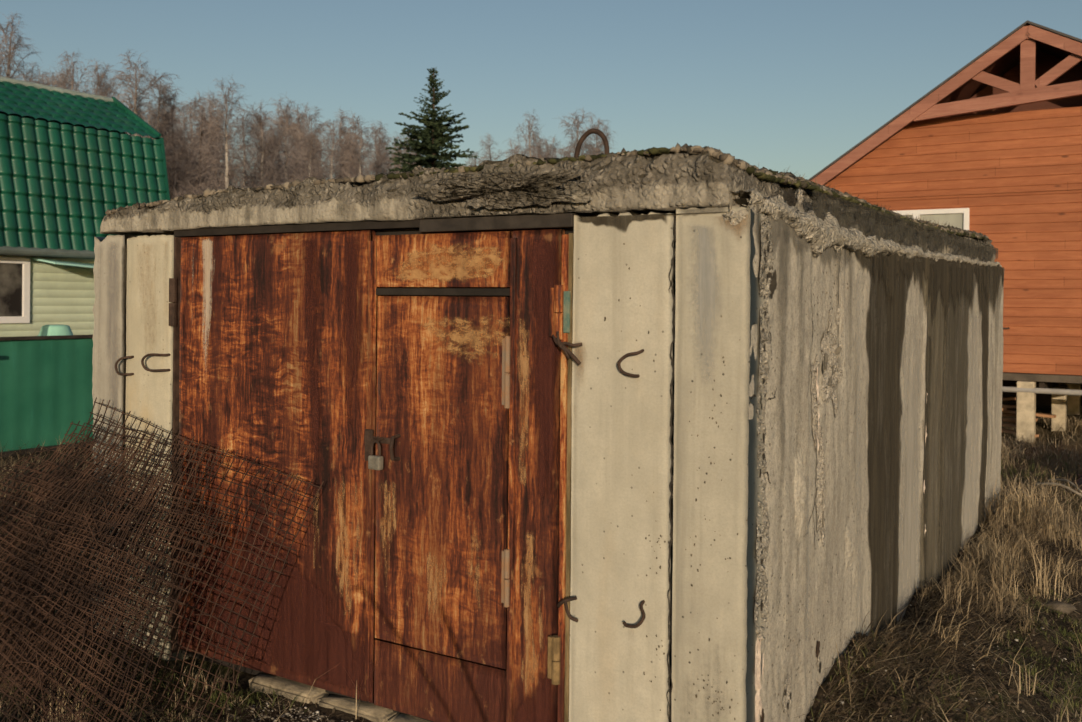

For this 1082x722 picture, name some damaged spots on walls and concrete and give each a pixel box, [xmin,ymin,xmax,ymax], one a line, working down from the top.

spalling [783,189,803,206]
rust [401,245,502,281]
rust [425,318,503,354]
rust [518,328,529,449]
spalling [811,305,843,453]
leakage [759,190,1005,635]
rust [336,489,356,607]
rust [381,484,396,554]
rust [427,553,445,611]
rust [521,534,544,687]